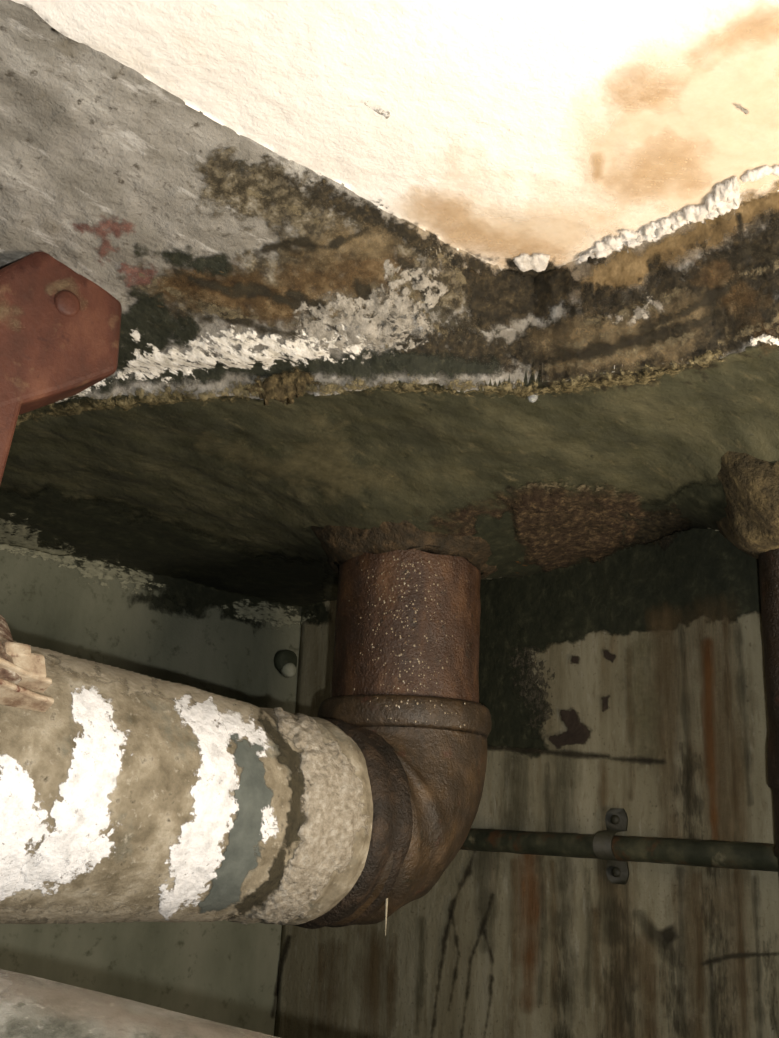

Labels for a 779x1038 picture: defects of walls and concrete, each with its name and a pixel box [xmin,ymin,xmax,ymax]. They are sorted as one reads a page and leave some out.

water stain [15,147,779,428]
water stain [473,481,761,764]
crack [432,851,494,1038]
water stain [642,916,684,1033]